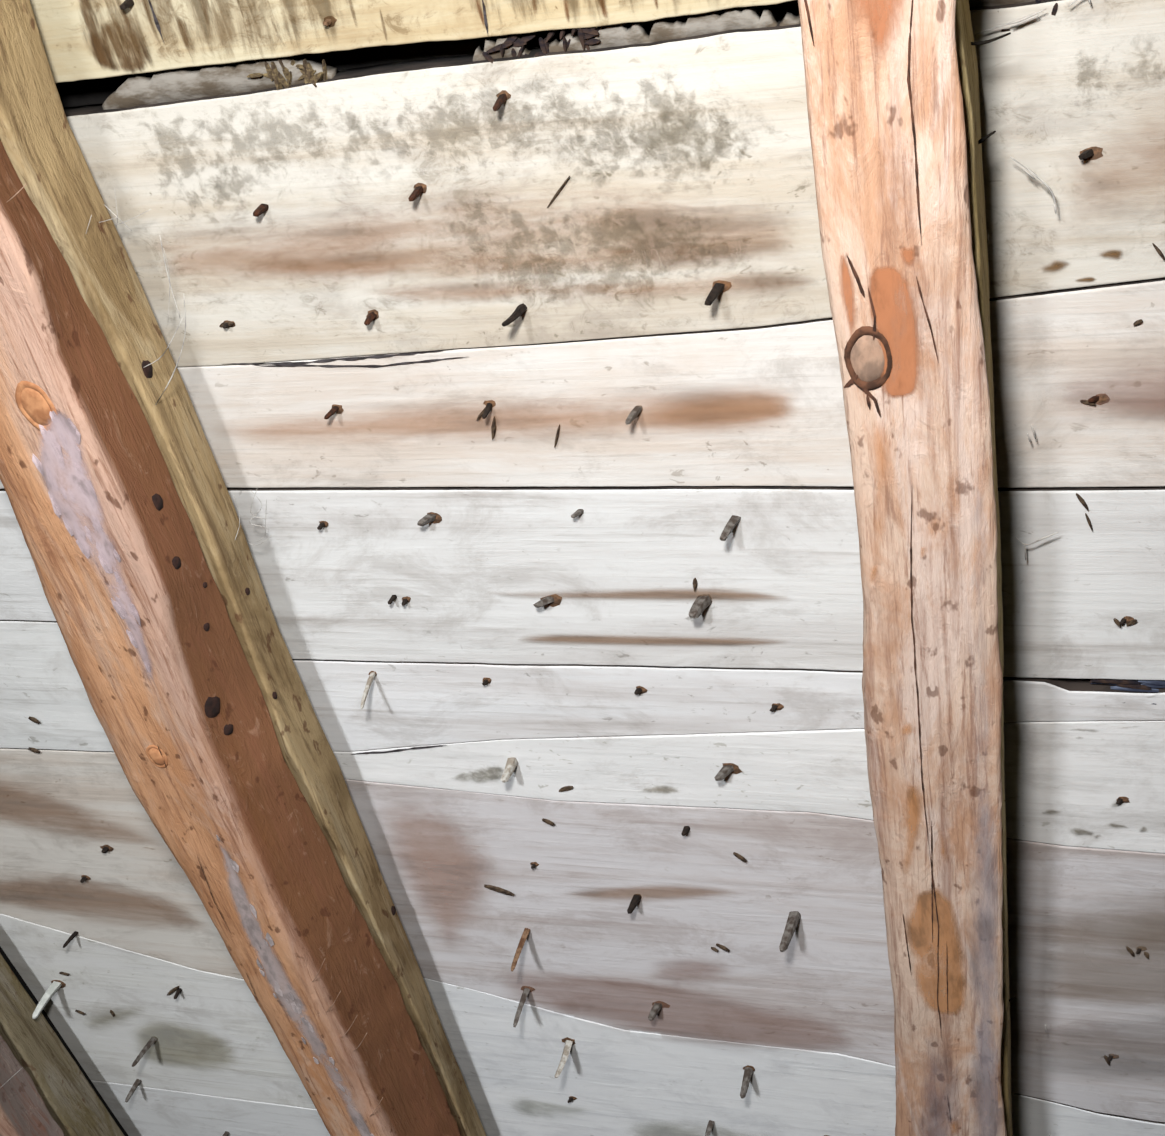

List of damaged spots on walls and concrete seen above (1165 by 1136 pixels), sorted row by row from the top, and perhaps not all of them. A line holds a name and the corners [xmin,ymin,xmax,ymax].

water stain [81,0,148,72]
crack [907,0,922,245]
crack [847,256,876,340]
crack [916,276,939,363]
crack [844,375,881,417]
crack [903,500,948,1039]